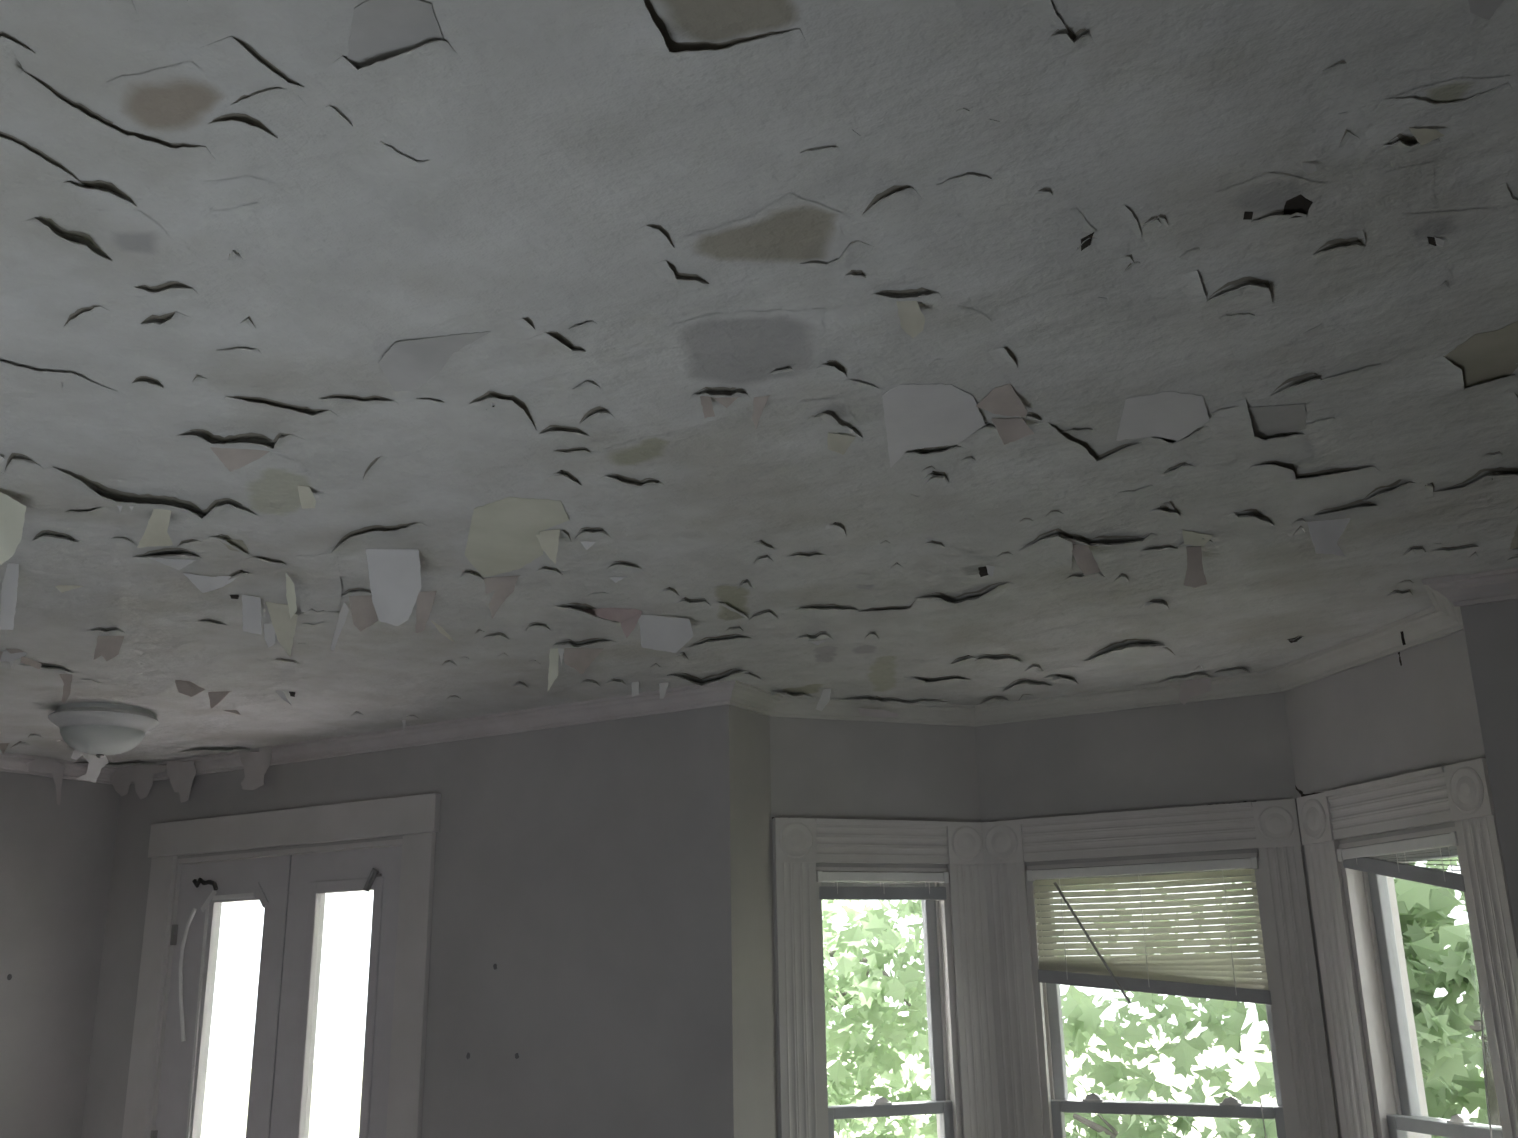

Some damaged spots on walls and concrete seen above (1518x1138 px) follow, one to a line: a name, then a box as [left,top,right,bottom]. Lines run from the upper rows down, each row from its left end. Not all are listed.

peeling [496,0,809,122]
peeling [0,0,465,336]
spalling [1213,163,1328,228]
peeling [507,317,597,361]
peeling [631,193,996,497]
peeling [1179,248,1273,319]
peeling [0,394,444,665]
peeling [332,522,469,667]
peeling [469,381,679,489]
peeling [525,540,831,711]
peeling [795,364,1518,616]
peeling [0,734,272,803]